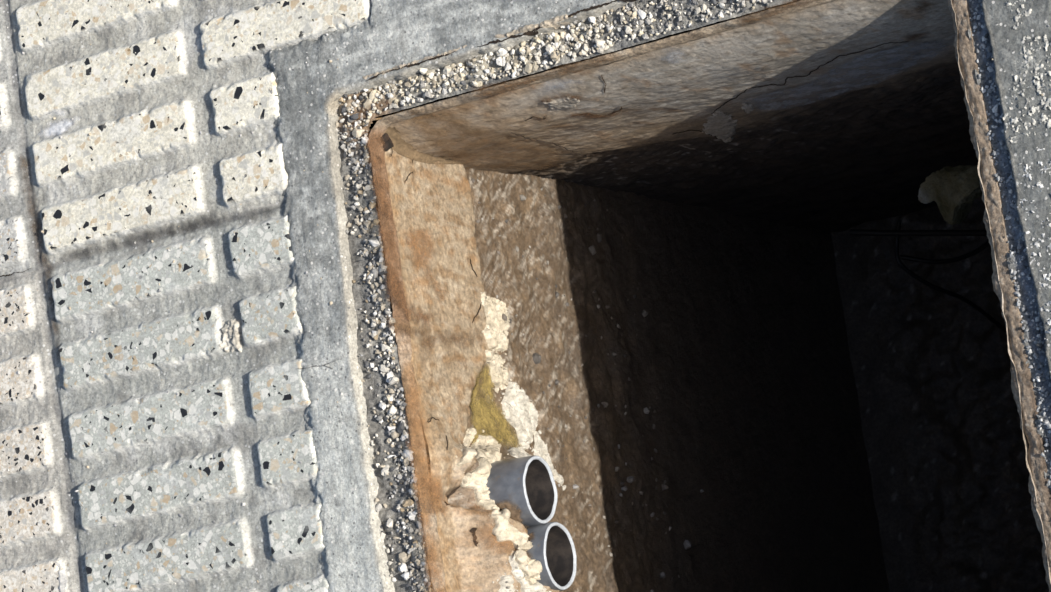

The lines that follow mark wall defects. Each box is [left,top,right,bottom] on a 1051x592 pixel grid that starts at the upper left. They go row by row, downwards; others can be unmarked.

crack [512,117,604,157]
crack [672,41,908,137]
spalling [362,0,1051,592]